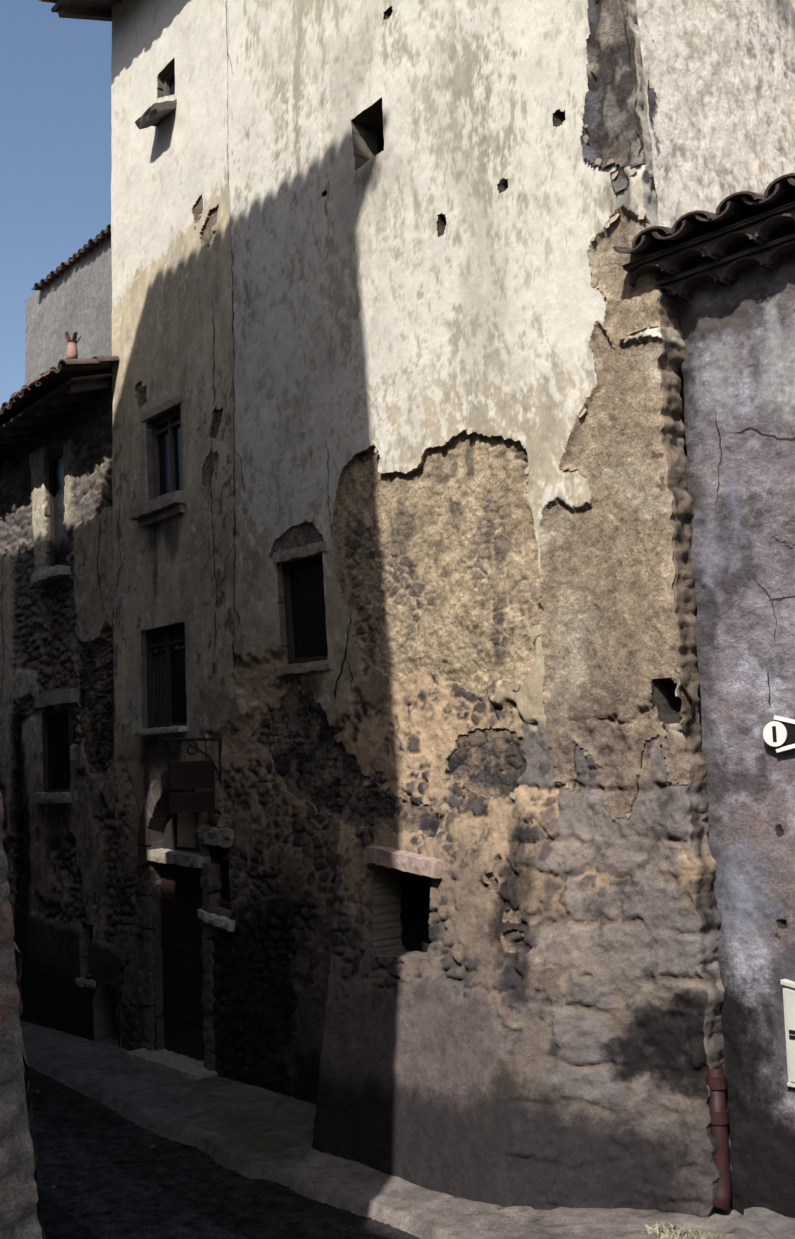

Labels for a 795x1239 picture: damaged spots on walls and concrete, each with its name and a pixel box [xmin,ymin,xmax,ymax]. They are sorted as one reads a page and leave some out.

flaking render [193,196,219,247]
flaking render [202,403,223,489]
flaking render [268,0,691,838]
crack [714,409,795,510]
flaking render [77,638,115,776]
spalling [504,907,526,952]
damp [212,894,684,1213]